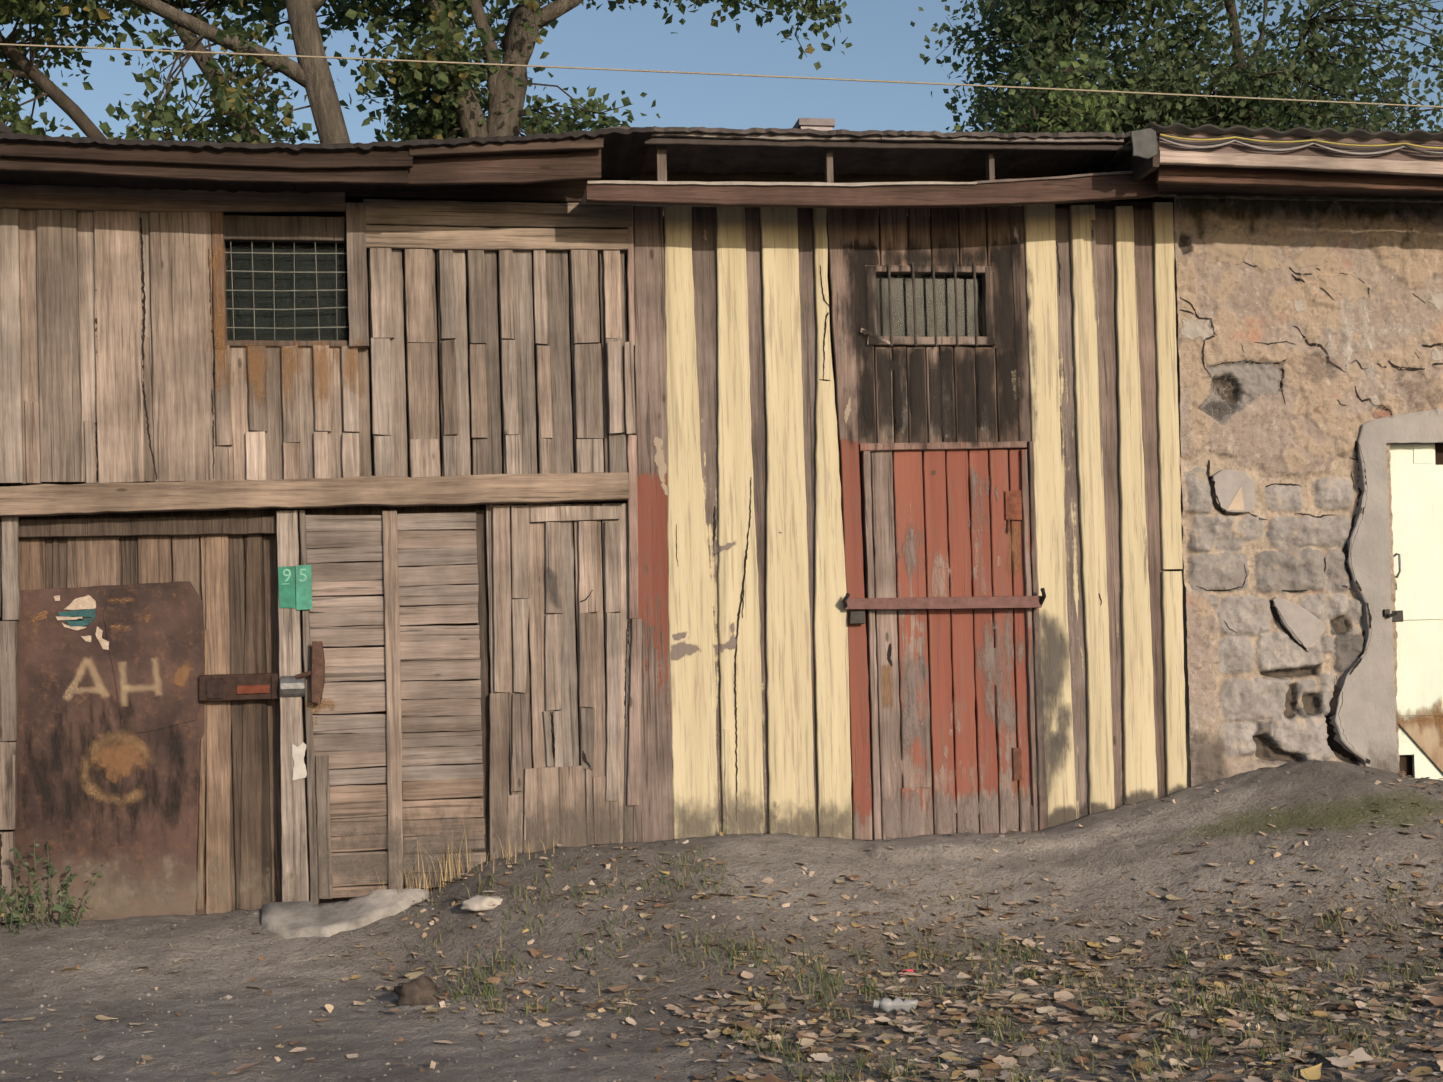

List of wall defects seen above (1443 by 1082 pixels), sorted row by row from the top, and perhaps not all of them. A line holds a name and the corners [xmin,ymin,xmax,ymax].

crack [139,218,157,480]
crack [819,265,831,381]
spalling [1198,353,1285,425]
crack [1179,297,1443,416]
flaking render [1207,460,1256,516]
crack [712,477,782,805]
flaking render [1261,597,1352,719]
crack [1247,441,1372,764]
corrosion [84,736,147,796]
peeling [880,655,1035,839]
spalling [1253,735,1301,762]
corrosion [1397,701,1443,744]